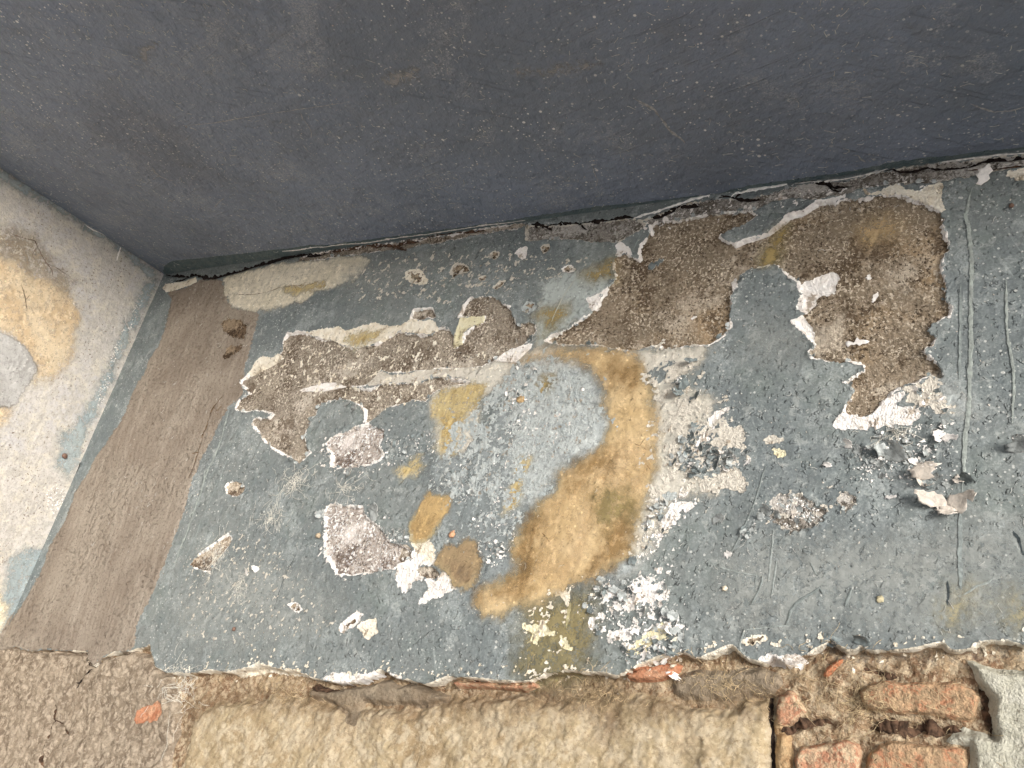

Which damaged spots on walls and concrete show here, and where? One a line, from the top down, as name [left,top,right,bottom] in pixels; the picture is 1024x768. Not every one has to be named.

crack [167,230,485,295]
crack [526,194,760,231]
crack [798,180,852,192]
crack [886,156,1024,173]
water stain [0,255,80,382]
flaking render [221,154,1024,515]
flaking render [315,502,456,604]
peeling [628,407,751,566]
flaking render [724,490,826,559]
peeling [554,576,684,681]